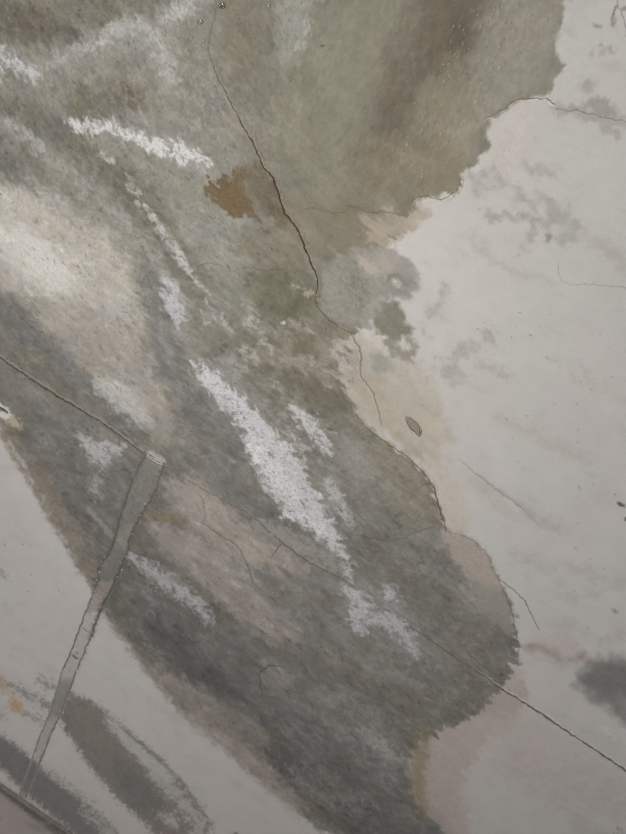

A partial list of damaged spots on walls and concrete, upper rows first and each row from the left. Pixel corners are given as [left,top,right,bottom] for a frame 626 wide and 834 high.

crack [610,0,626,29]
crack [483,97,626,123]
rust [201,160,282,239]
damp [282,268,317,306]
crack [195,0,447,541]
damp [279,310,322,345]
crack [0,354,146,453]
damp [0,359,142,593]
damp [576,479,626,515]
crack [164,459,626,772]
damp [0,670,240,834]